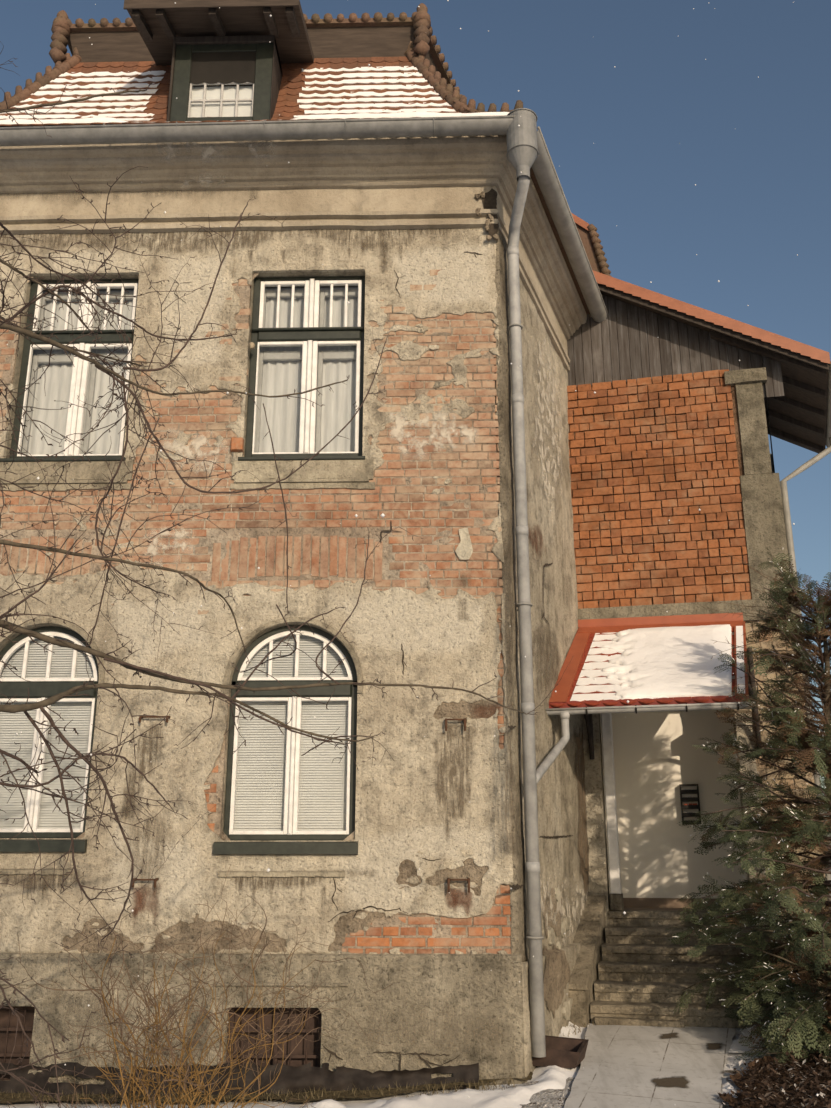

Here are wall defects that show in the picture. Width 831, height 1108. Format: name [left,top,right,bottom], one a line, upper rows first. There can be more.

damp [1,230,274,265]
damp [310,229,448,270]
spalling [205,278,252,344]
spalling [0,300,509,765]
damp [435,725,471,832]
peeling [392,850,489,896]
peeling [59,914,287,954]
spalling [328,884,511,954]